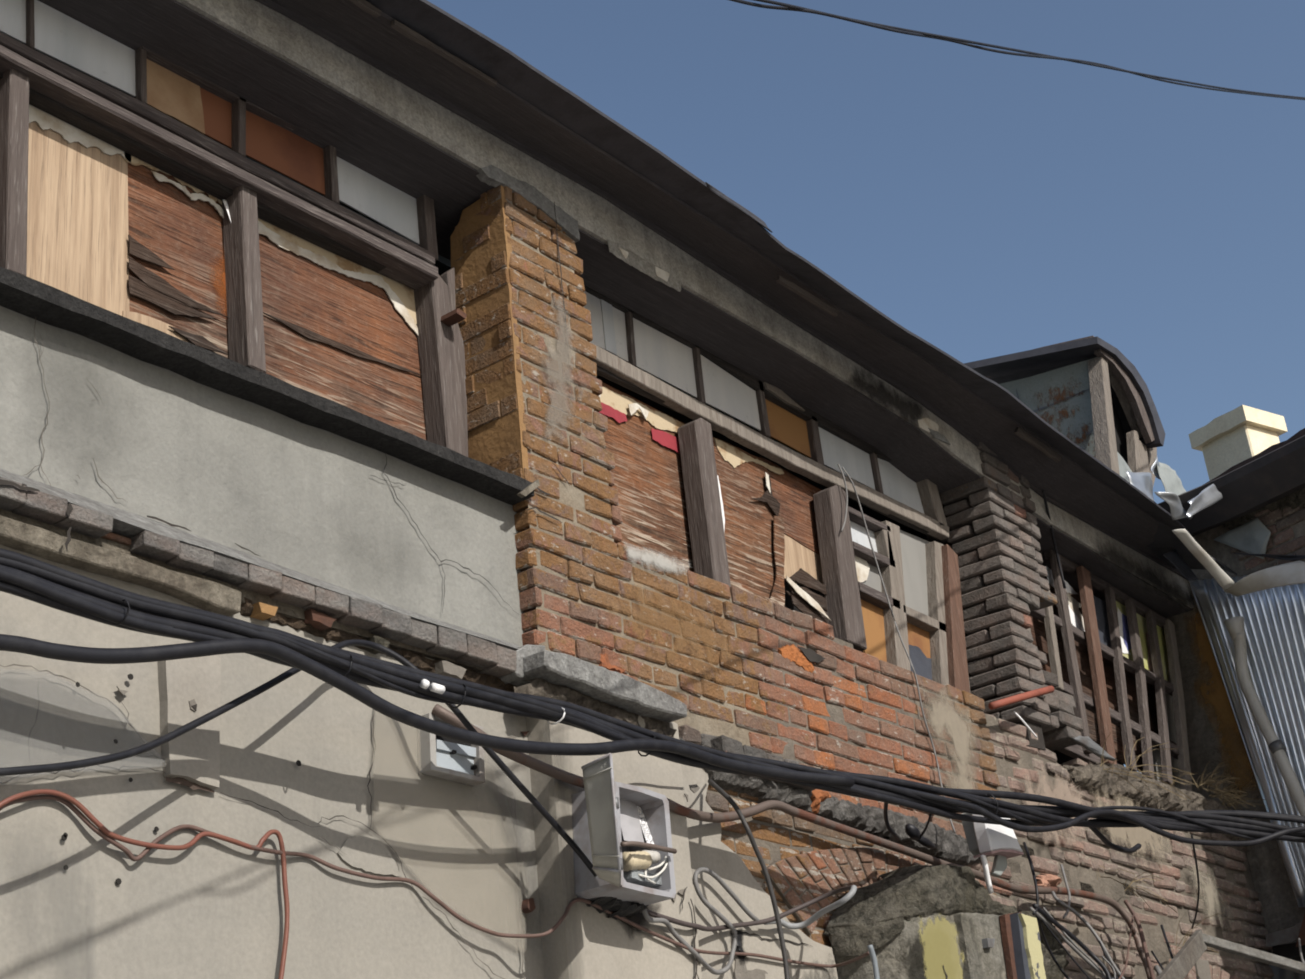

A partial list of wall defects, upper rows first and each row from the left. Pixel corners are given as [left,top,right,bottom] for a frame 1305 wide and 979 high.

crack [0,317,190,552]
crack [371,454,515,617]
crack [0,770,81,784]
crack [0,664,139,735]
crack [114,711,525,979]
spalling [684,714,1274,979]